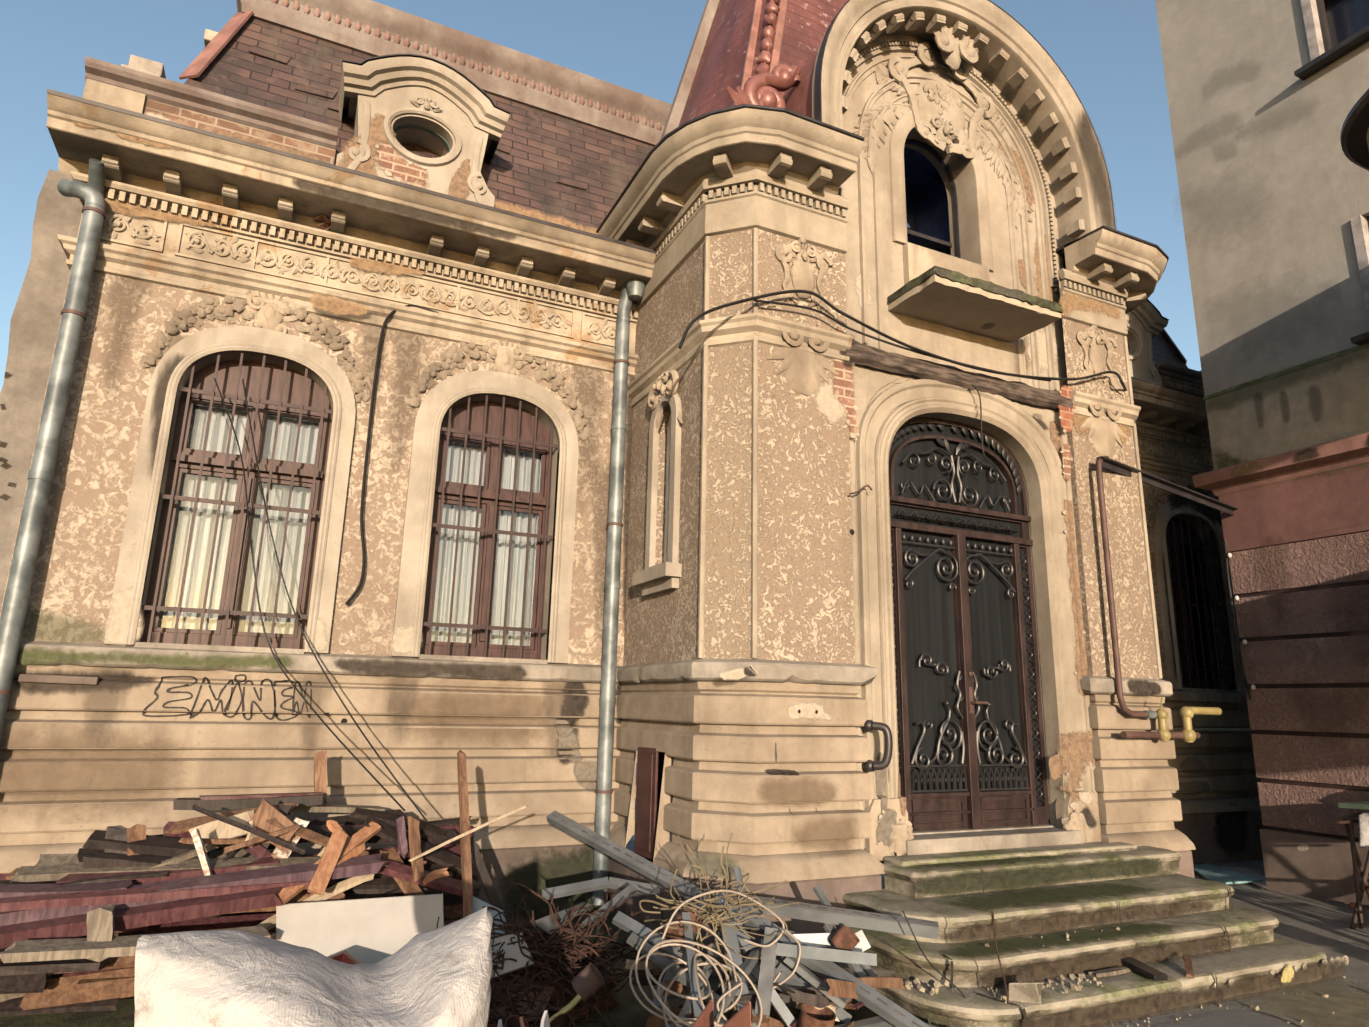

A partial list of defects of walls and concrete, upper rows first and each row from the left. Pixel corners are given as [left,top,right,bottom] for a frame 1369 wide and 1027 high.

flaking render [338,114,428,188]
flaking render [1026,331,1058,369]
flaking render [816,359,860,440]
flaking render [1034,385,1090,481]
flaking render [1062,499,1088,696]
flaking render [876,753,906,846]
flaking render [1049,731,1097,827]
leakage [1215,804,1248,855]